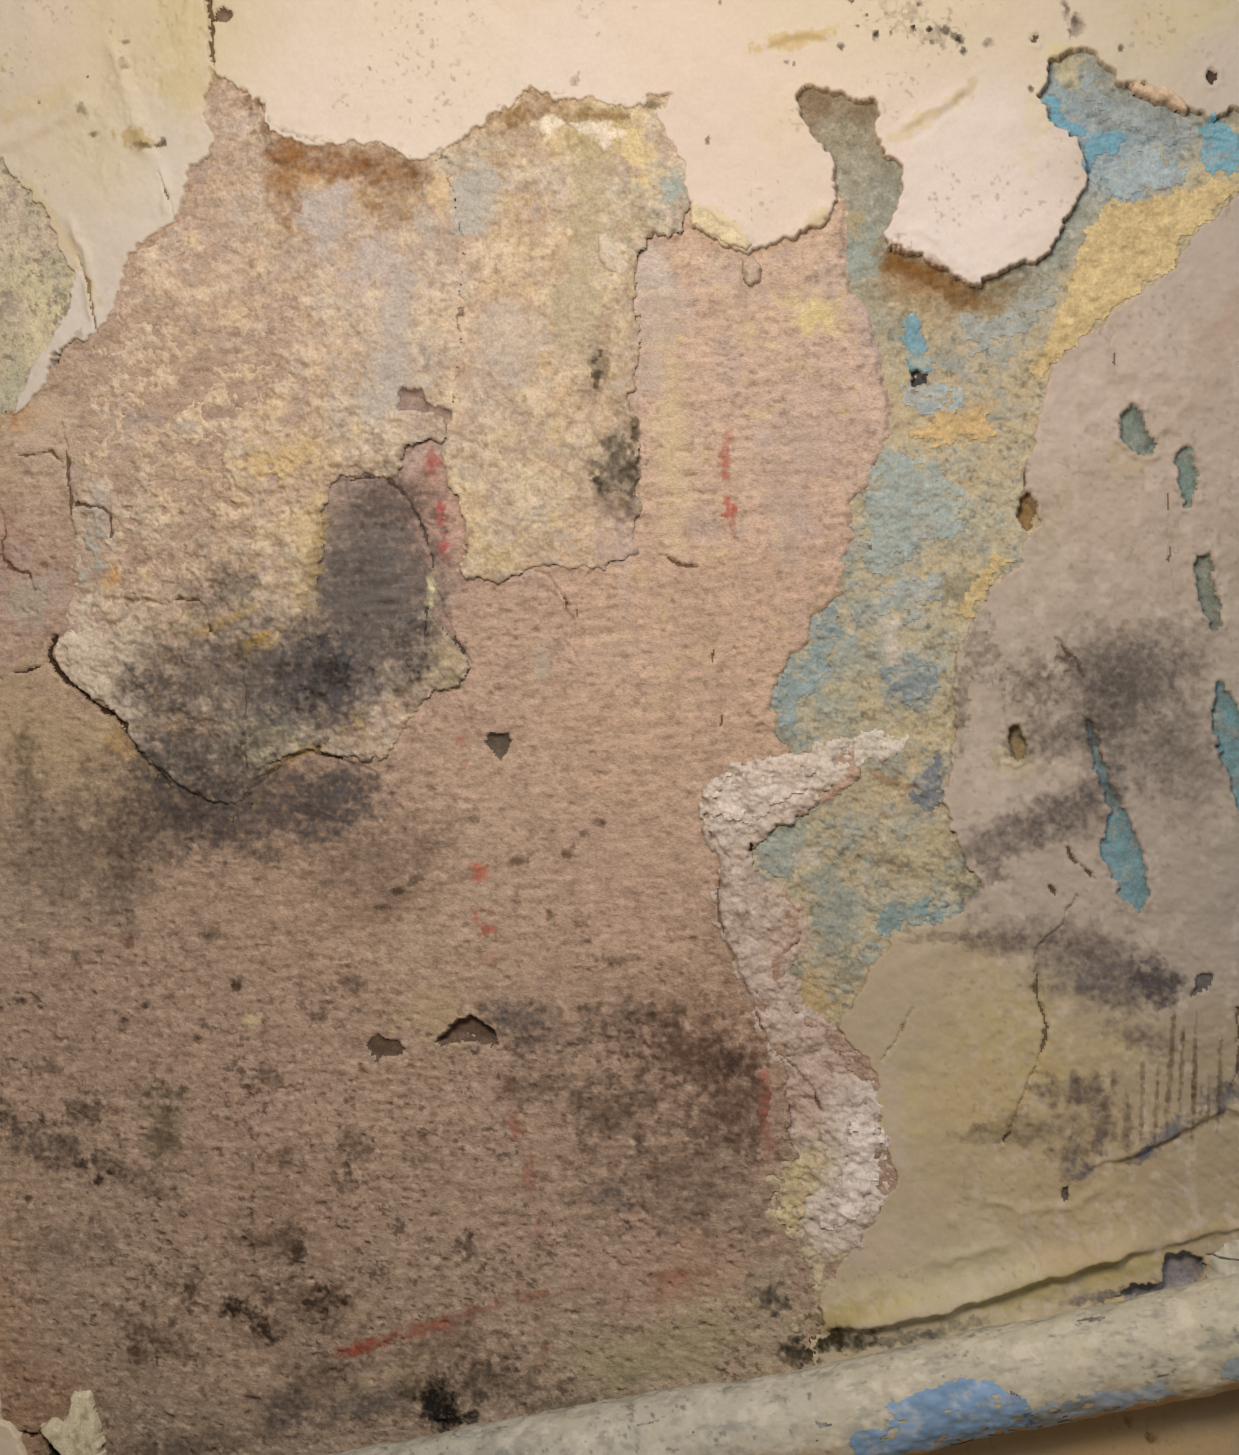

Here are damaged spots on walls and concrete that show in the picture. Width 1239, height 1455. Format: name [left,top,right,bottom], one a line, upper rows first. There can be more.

rust [264,130,403,200]
crack [18,450,113,538]
crack [0,530,32,580]
peeling [748,52,1239,1027]
leakage [97,478,444,857]
flaking render [0,70,909,1455]
crack [1048,847,1092,895]
crack [1033,974,1049,1052]
crack [1231,1007,1239,1074]
leakage [621,1007,768,1164]
mould [352,1345,536,1433]